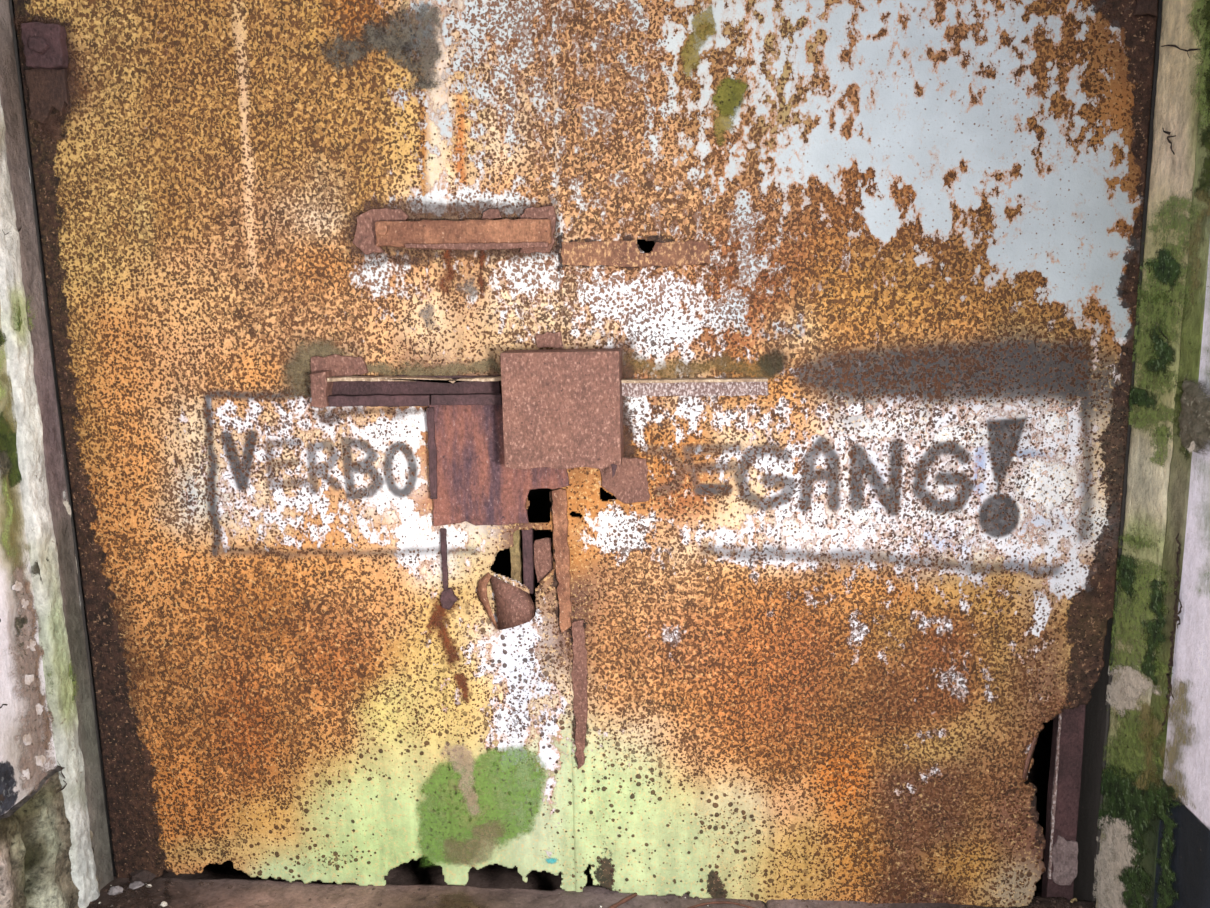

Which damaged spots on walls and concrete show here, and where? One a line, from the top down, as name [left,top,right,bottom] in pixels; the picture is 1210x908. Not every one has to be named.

rust [437,249,455,292]
damp [0,412,22,487]
spalling [0,566,55,817]
rust [426,601,469,703]
damp [1106,665,1160,717]
damp [1093,816,1140,908]